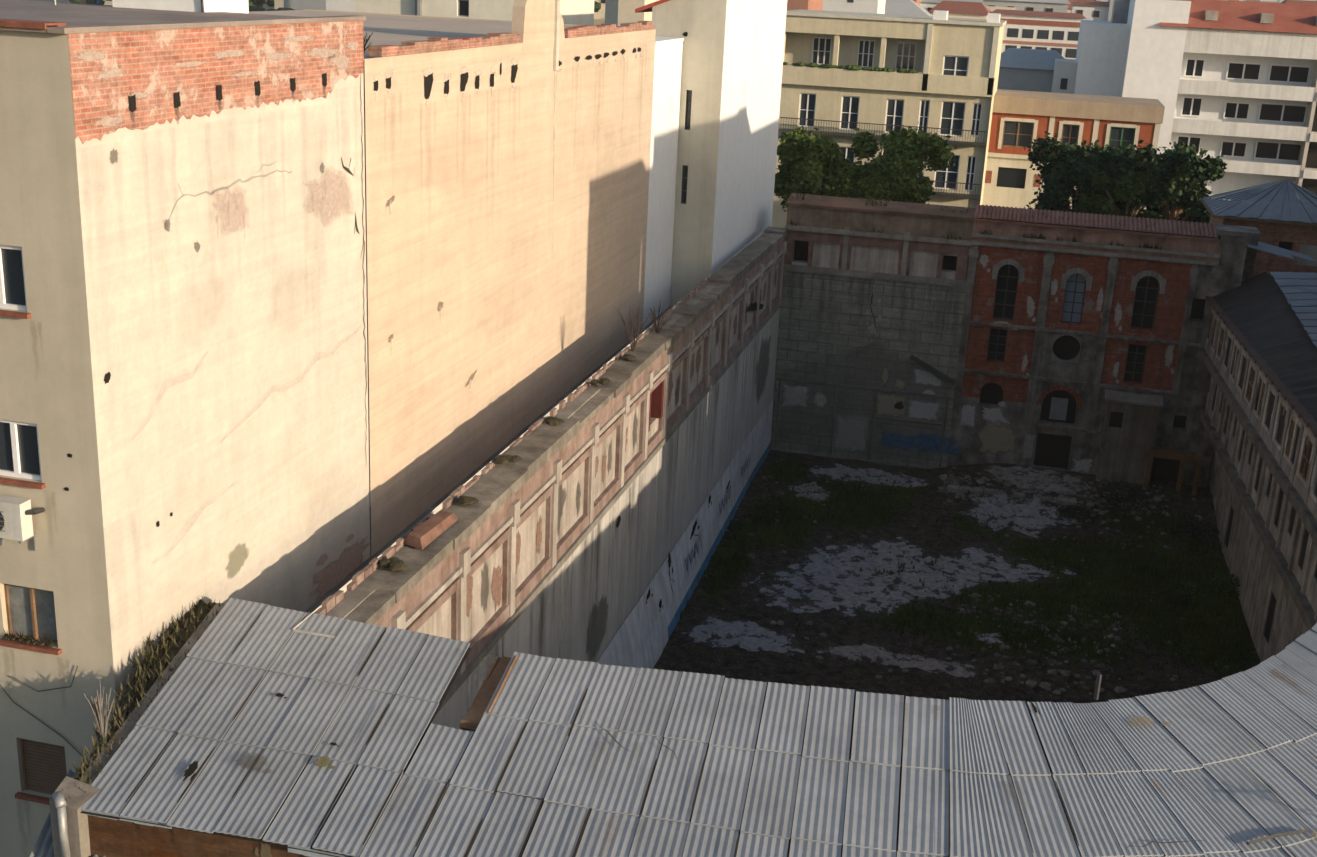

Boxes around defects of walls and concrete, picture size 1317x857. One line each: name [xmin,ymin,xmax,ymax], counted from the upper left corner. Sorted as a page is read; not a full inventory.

spalling [68,20,391,144]
crack [162,161,292,232]
flaking render [834,367,942,451]
flaking render [960,401,1009,427]
flaking render [314,534,369,601]